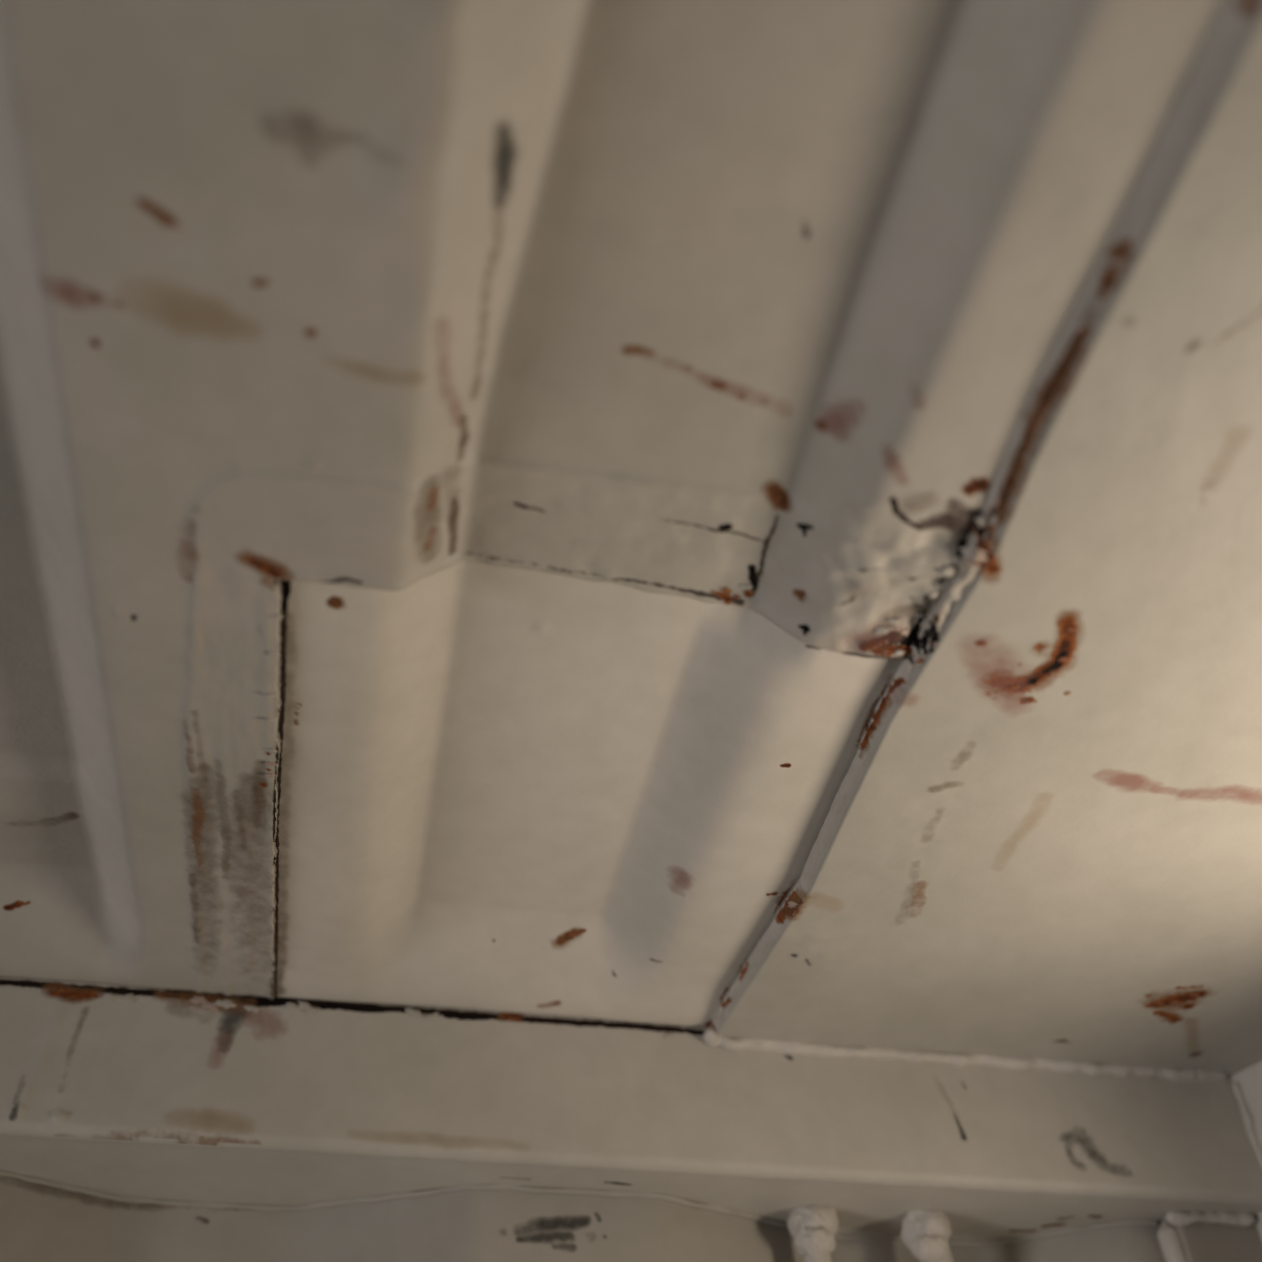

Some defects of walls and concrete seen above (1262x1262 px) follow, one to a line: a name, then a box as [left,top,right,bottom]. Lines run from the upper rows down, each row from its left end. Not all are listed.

peeling [796,523,813,537]
peeling [890,477,991,577]
corrosion [240,555,291,600]
crack [322,576,363,584]
crack [805,645,915,664]
peeling [872,626,920,657]
corrosion [984,613,1079,705]
corrosion [857,678,905,750]
crack [0,591,704,1039]
corrosion [766,886,805,924]
corrosion [556,928,586,945]
corrosion [1145,986,1207,1024]